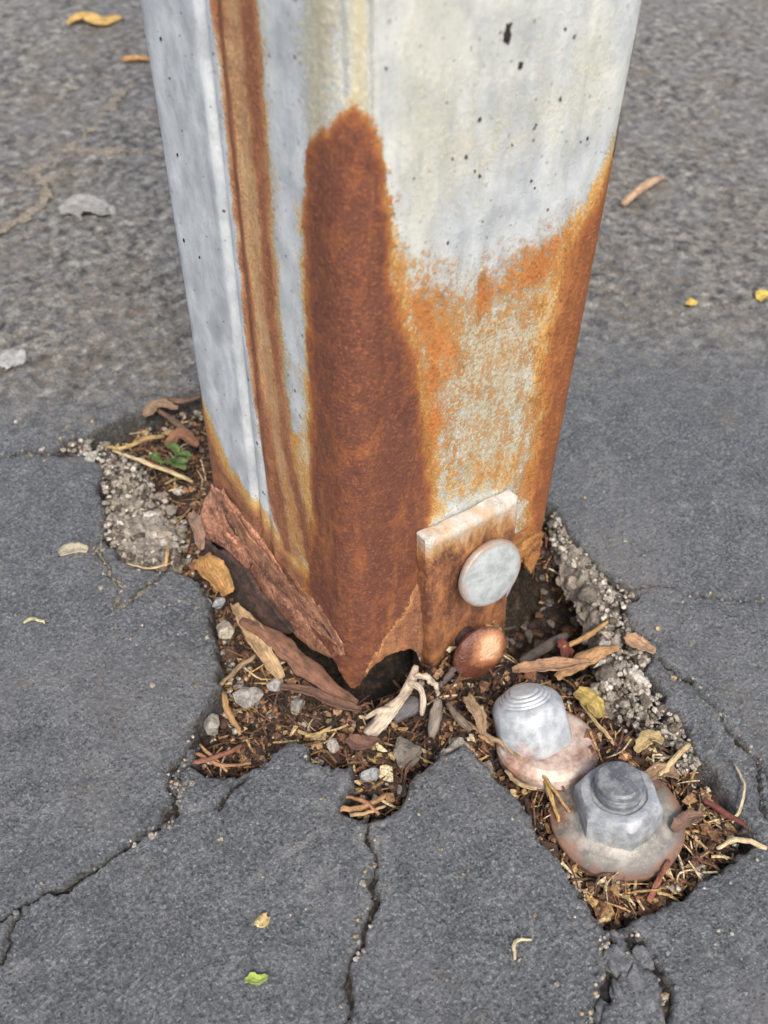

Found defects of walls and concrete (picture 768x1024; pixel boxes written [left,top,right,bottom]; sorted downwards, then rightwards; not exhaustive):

corrosion [199,0,641,688]
crack [2,741,199,963]
crack [219,779,245,809]
crack [361,828,380,948]
crack [344,973,354,1024]
crack [591,935,672,1024]